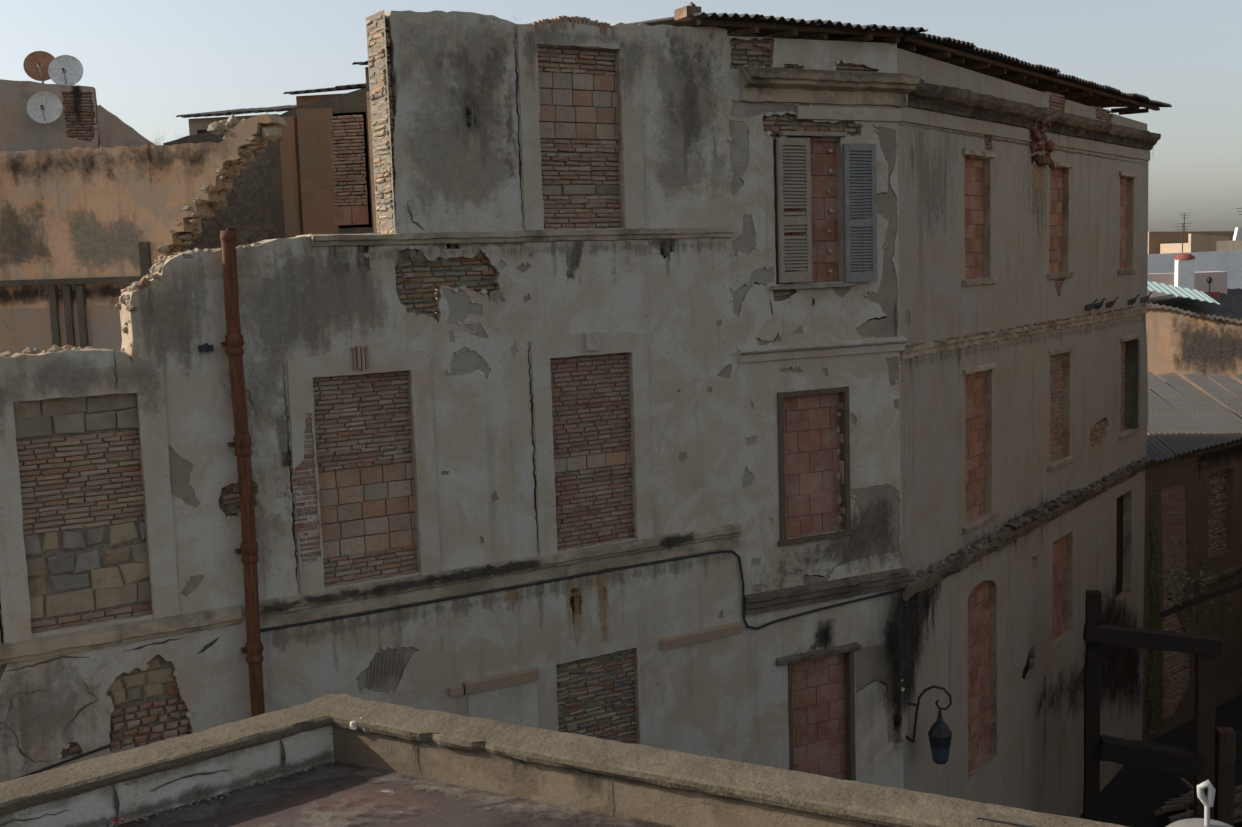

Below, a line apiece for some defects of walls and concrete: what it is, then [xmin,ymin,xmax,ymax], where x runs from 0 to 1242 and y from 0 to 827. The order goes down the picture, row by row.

spalling [156,114,283,256]
peeling [717,99,910,338]
flaking render [395,245,533,378]
peeling [168,444,200,508]
flaking render [218,478,256,520]
flaking render [290,415,321,571]
flaking render [106,654,194,751]